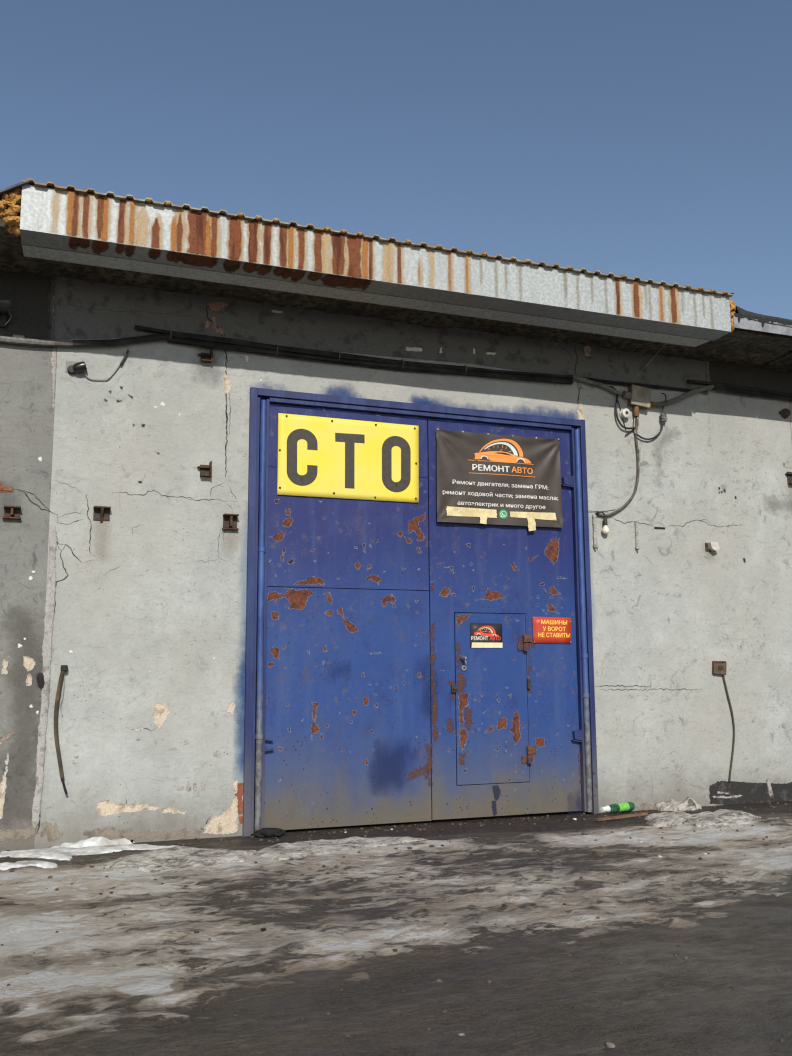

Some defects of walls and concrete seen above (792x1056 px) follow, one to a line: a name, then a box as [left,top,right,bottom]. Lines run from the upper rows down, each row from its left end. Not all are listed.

rust [53,192,403,290]
rust [615,279,642,317]
rust [660,286,680,323]
crack [69,305,236,562]
crack [17,482,116,613]
rust [269,508,293,562]
rust [397,512,425,553]
rust [267,576,359,633]
rust [355,562,396,607]
peeling [18,638,36,686]
rust [405,623,472,786]
spalling [83,780,243,840]